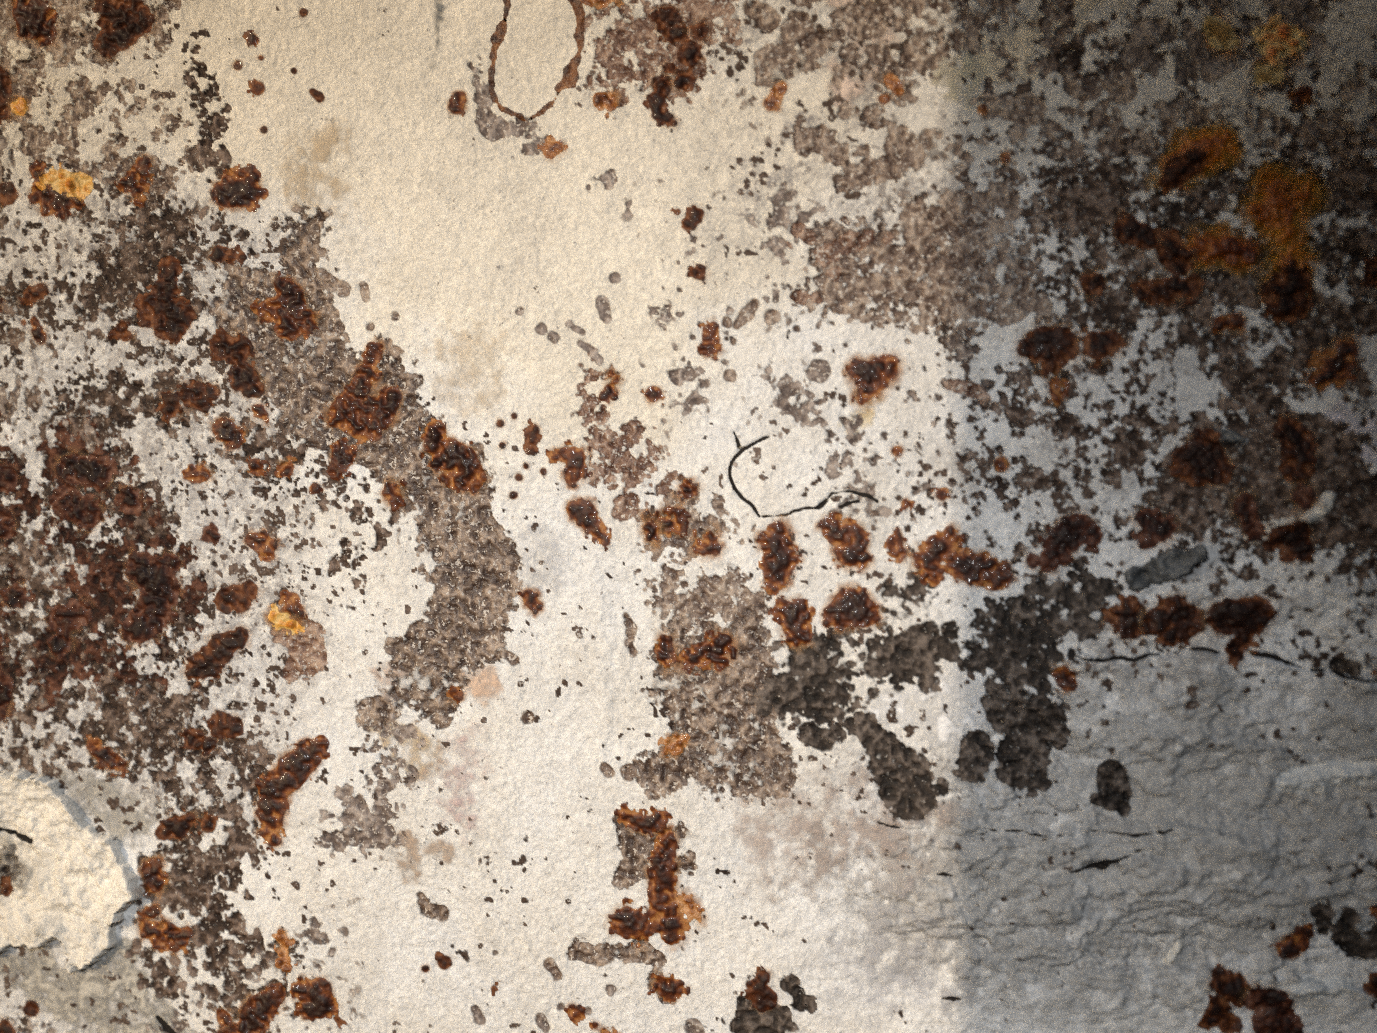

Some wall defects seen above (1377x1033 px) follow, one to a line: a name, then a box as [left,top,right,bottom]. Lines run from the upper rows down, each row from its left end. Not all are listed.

rust [154,326,297,479]
rust [844,355,901,405]
rust [496,413,612,551]
crack [728,432,879,518]
rust [183,579,308,689]
rust [756,499,1103,648]
rust [1099,591,1278,671]
rust [254,735,330,853]
rust [137,808,218,955]
rust [608,802,705,948]
rust [216,928,347,1033]
rust [1197,963,1304,1033]